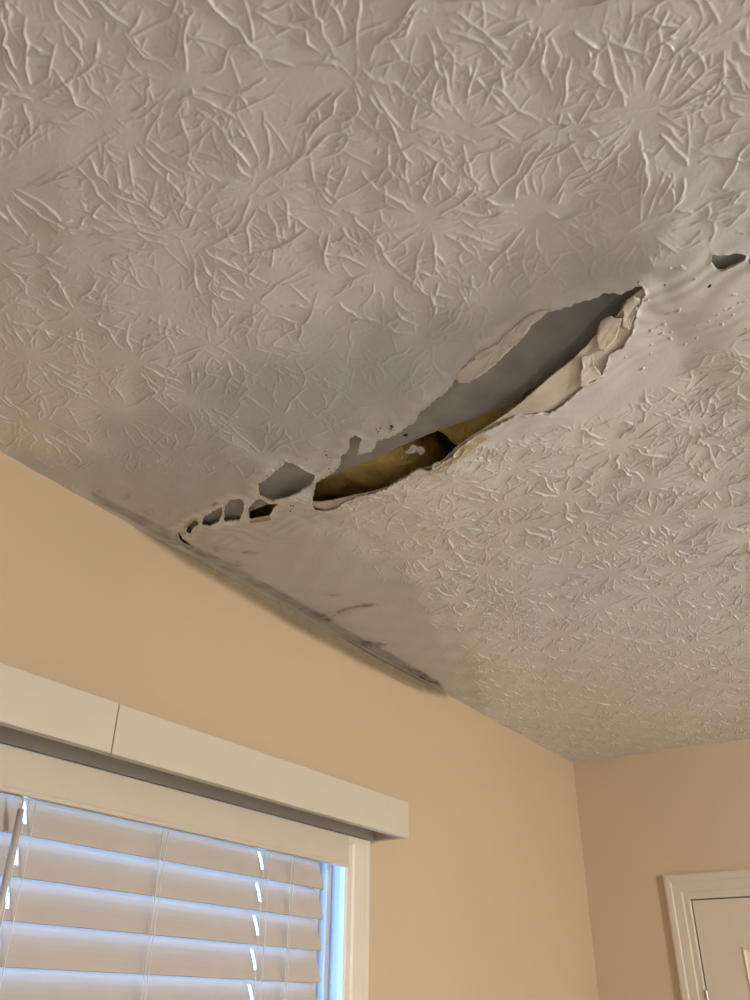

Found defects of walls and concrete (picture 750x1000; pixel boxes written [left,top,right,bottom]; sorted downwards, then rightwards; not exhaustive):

water stain [158,540,443,693]